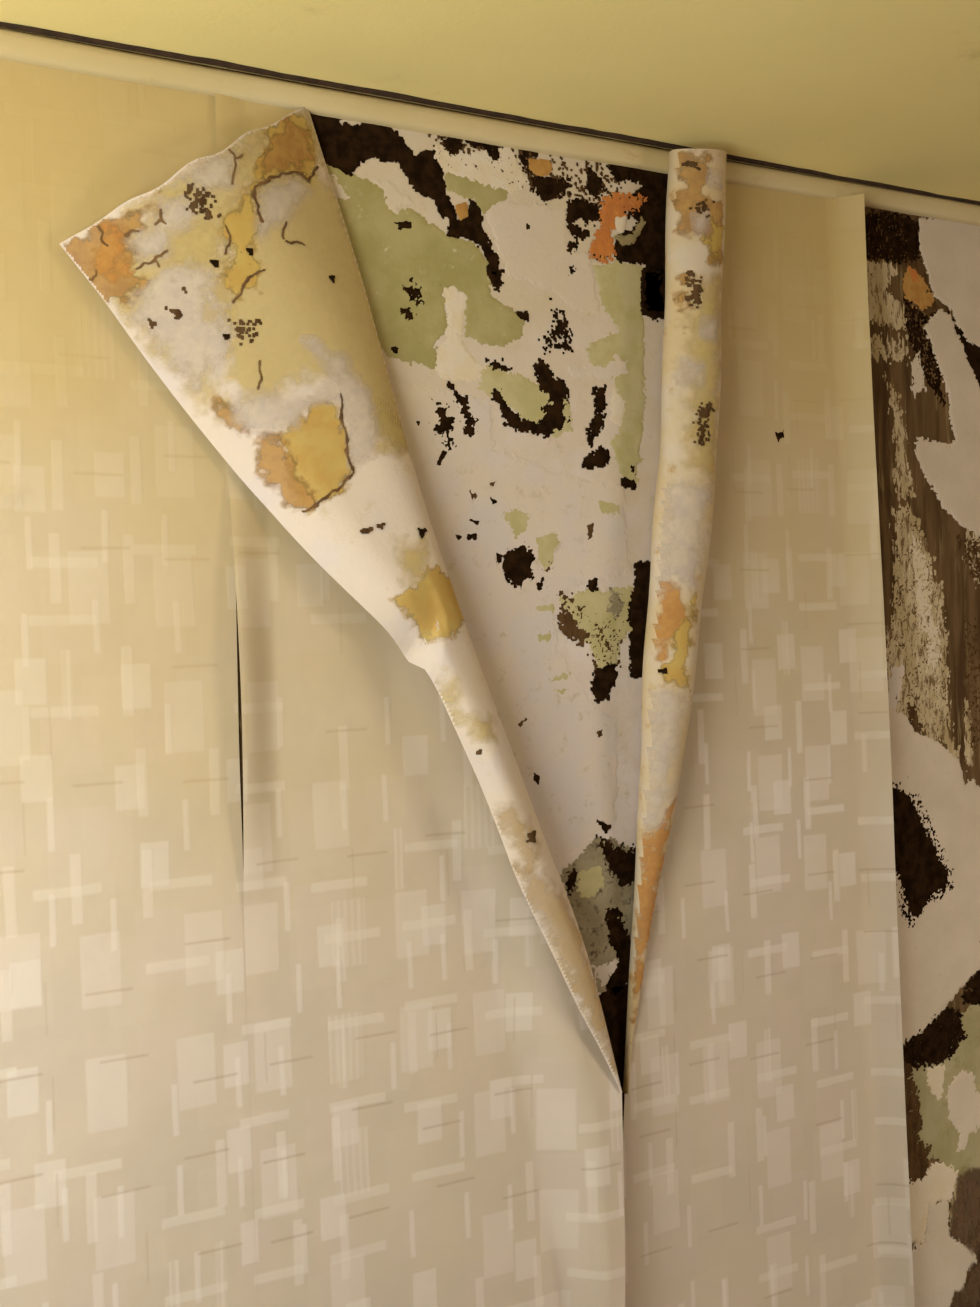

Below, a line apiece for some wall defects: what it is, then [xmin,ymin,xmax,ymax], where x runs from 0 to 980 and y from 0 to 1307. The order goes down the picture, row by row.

peeling [137,202,191,253]
peeling [193,156,231,186]
peeling [261,181,306,229]
spalling [914,217,980,537]
flaking render [326,128,680,995]
spalling [889,708,980,1307]